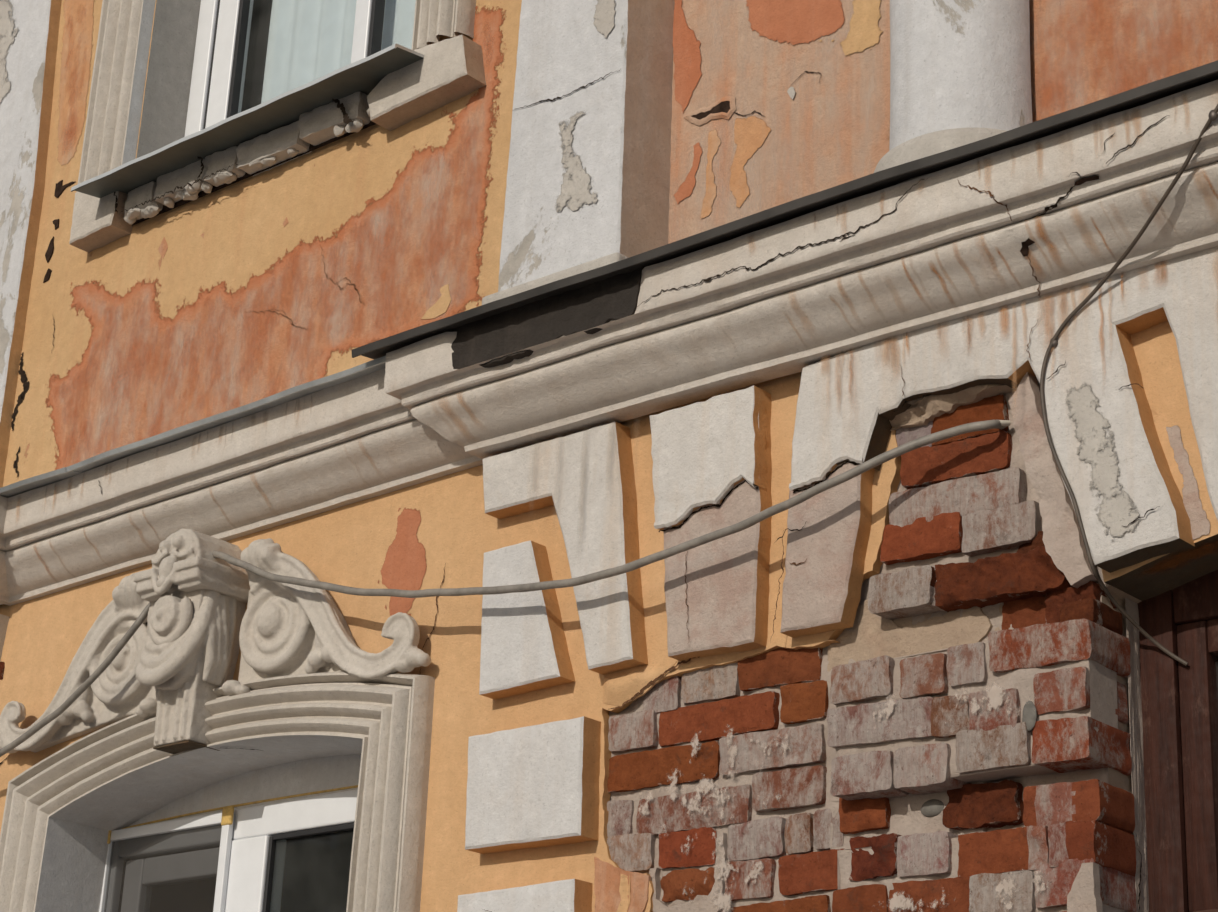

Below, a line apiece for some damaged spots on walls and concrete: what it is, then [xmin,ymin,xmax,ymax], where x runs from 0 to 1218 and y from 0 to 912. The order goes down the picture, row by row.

peeling [0,0,19,103]
peeling [43,0,646,470]
peeling [668,0,890,244]
crack [631,178,928,315]
crack [957,115,1169,222]
crack [11,353,29,477]
peeling [378,507,427,616]
spalling [594,372,1141,912]